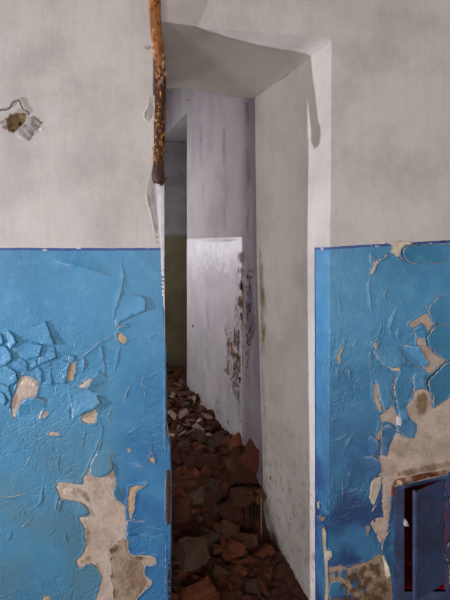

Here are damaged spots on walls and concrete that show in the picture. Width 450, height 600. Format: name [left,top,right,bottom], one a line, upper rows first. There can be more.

flaking render [1,108,43,142]
flaking render [145,177,165,335]
peeling [368,238,450,278]
peeling [0,321,110,426]
mould [225,270,252,412]
peeling [316,294,450,600]
peeling [53,438,160,600]